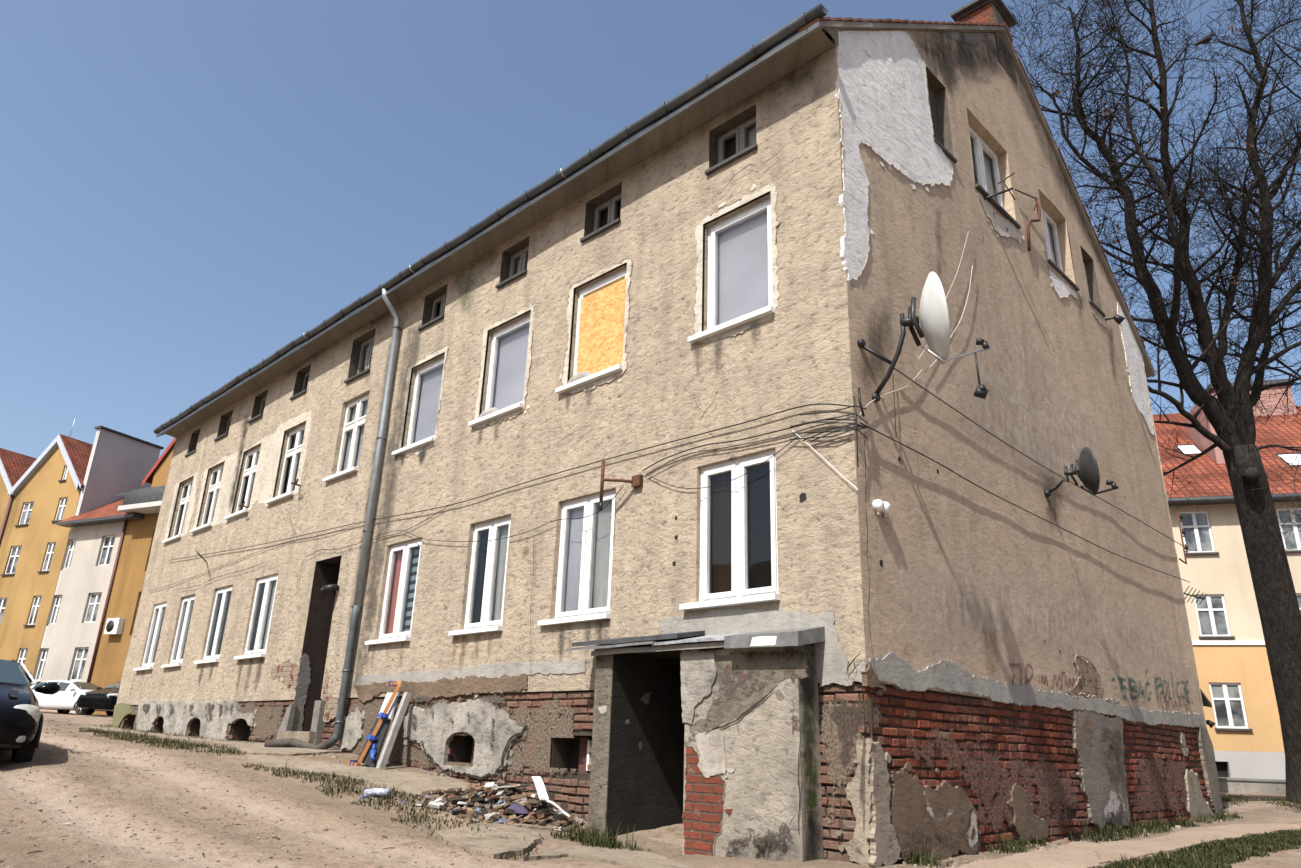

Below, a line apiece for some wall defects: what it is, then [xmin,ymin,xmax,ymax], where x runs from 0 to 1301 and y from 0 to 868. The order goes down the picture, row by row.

flaking render [834,30,953,284]
spalling [977,192,1025,247]
flaking render [1043,257,1154,436]
spalling [1044,640,1103,698]
peeling [680,649,809,856]
peeling [885,752,919,781]
leakage [806,815,820,861]